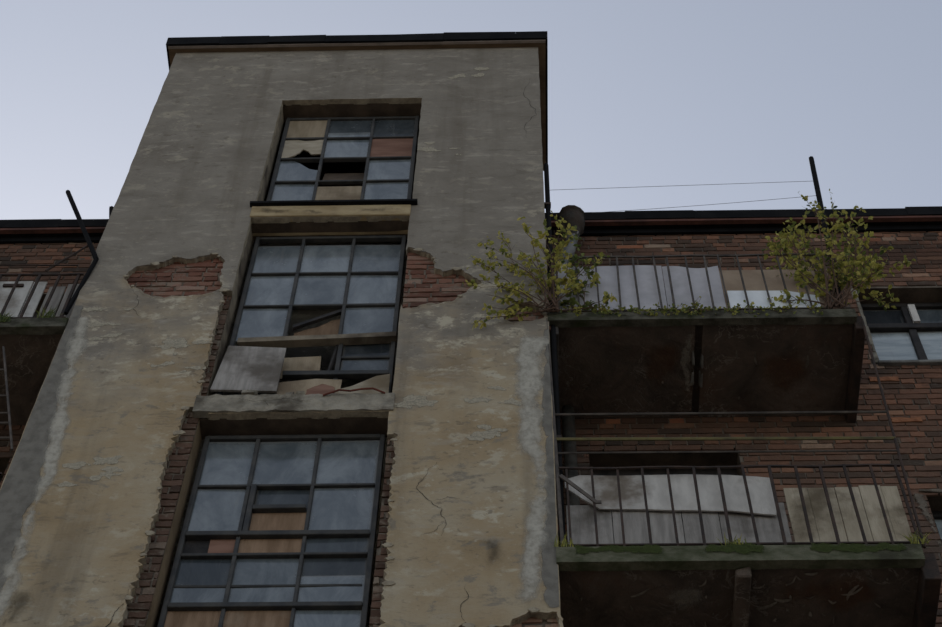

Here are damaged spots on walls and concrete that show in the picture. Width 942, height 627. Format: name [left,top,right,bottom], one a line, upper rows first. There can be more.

flaking render [121,252,230,305]
flaking render [402,246,485,309]
leakage [516,329,559,608]
flaking render [456,607,563,627]